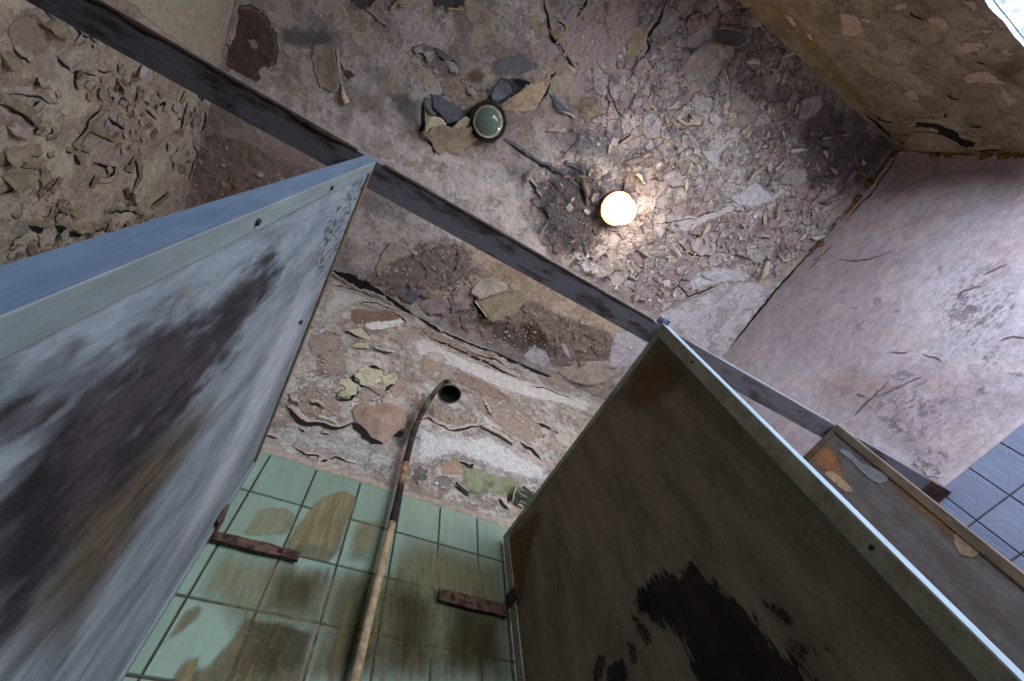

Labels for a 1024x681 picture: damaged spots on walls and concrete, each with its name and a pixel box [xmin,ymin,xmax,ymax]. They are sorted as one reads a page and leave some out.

peeling [2,124,88,263]
spalling [88,187,155,239]
peeling [76,63,309,202]
flaking render [127,0,278,83]
peeling [311,43,355,105]
crack [607,85,633,148]
peeling [411,0,878,307]
crack [651,240,725,299]
peeling [276,289,406,471]
peeling [375,241,647,508]
leakage [247,492,373,561]
leakage [174,548,505,681]